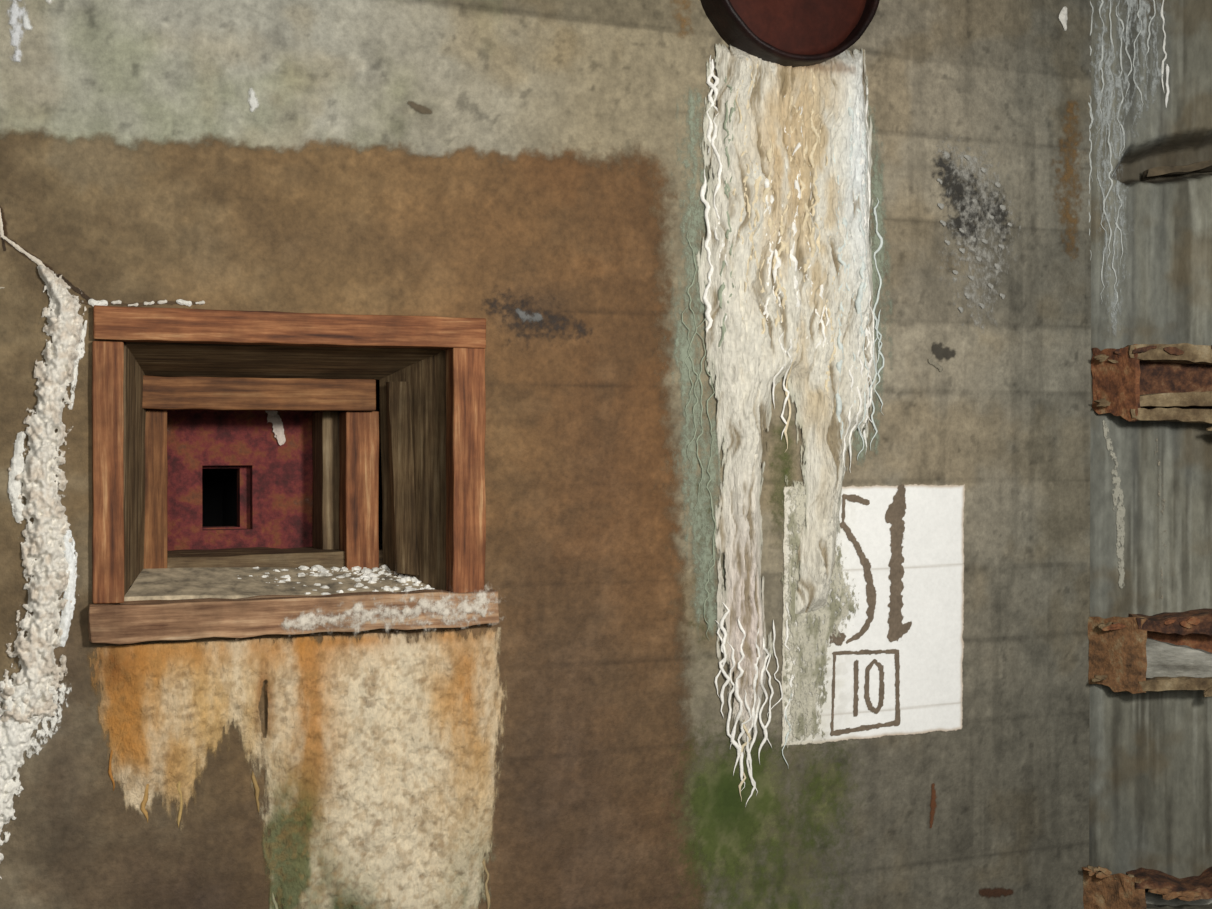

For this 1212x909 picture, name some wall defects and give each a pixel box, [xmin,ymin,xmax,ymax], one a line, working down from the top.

damp [8,0,32,61]
efflorescence [1088,0,1170,329]
crack [0,207,205,307]
rust [1094,346,1184,363]
damp [0,43,892,909]
rust [1164,617,1200,628]
rust [1082,865,1112,879]
rust [1148,887,1201,901]